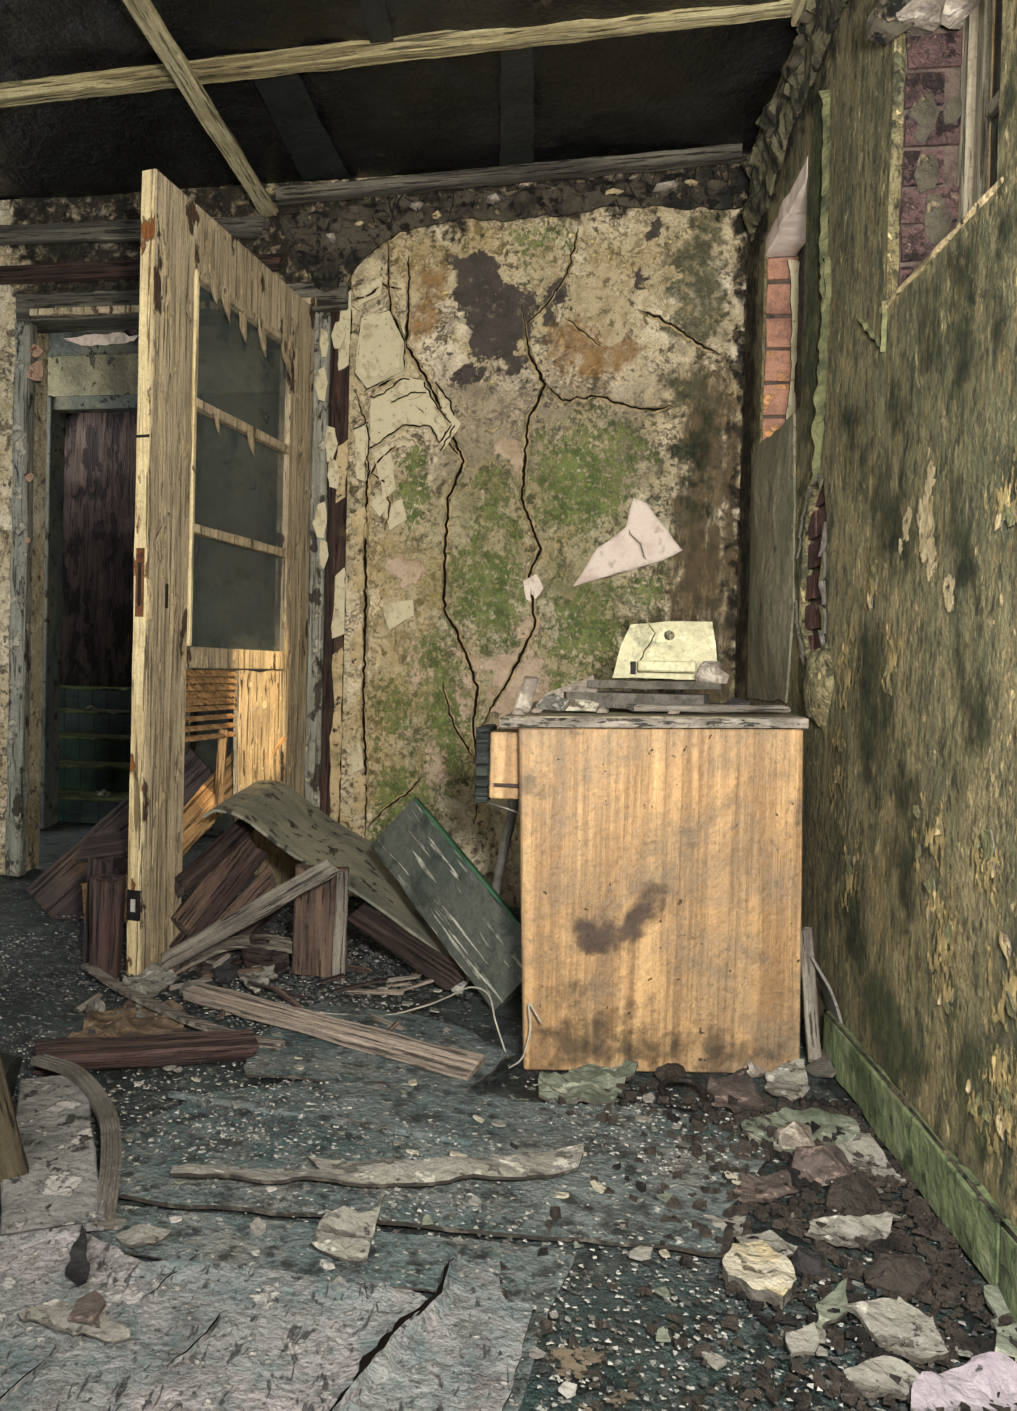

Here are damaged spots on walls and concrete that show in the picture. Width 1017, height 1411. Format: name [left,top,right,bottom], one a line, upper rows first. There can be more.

leakage [9,241,141,264]
leakage [9,191,142,225]
leakage [13,279,140,297]
leakage [177,151,751,282]
spalling [277,0,849,592]
leakage [427,0,860,703]
crack [638,309,721,356]
flaking render [866,0,981,289]
crack [352,229,681,837]
flaking render [898,448,955,612]
flaking render [383,553,552,787]
peeling [954,829,1017,1168]